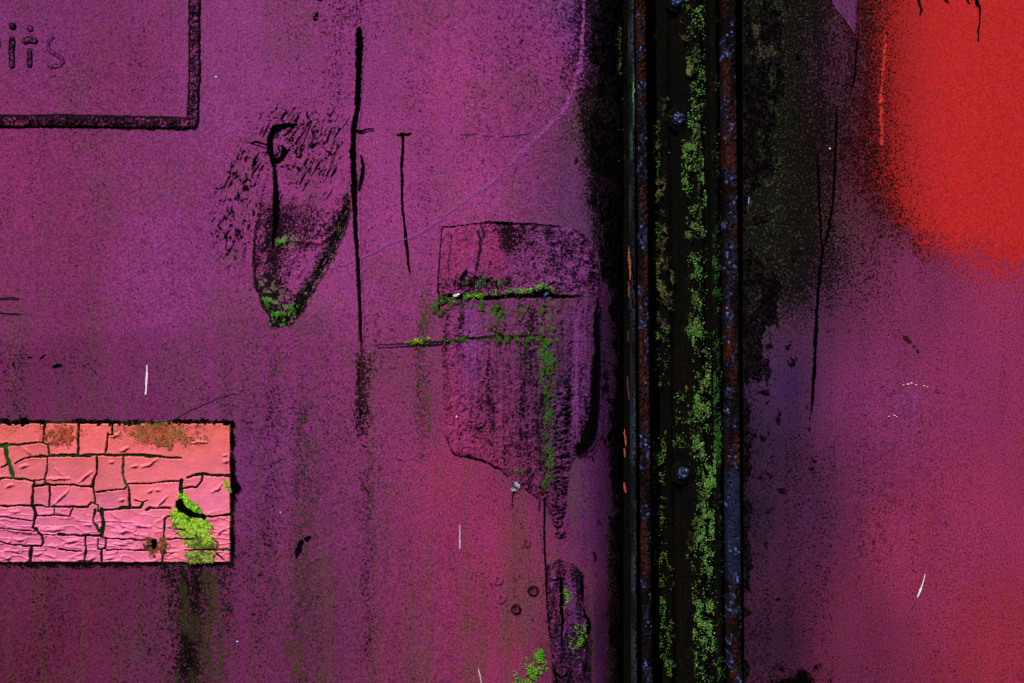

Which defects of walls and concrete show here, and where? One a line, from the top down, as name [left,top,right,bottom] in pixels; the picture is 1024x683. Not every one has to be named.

crack [0,420,234,566]
water stain [150,563,244,683]